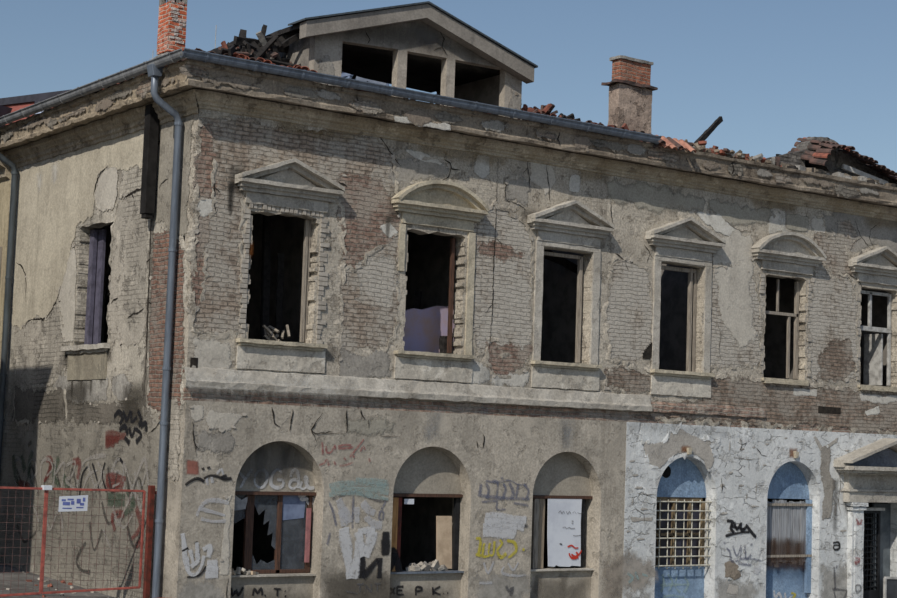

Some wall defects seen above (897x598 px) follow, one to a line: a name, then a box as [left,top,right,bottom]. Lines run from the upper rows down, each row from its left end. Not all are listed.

spalling [315,55,464,131]
peeling [529,162,556,196]
spalling [756,168,879,198]
crack [487,158,550,367]
crack [25,287,61,326]
spalling [9,111,449,481]
spalling [467,199,536,388]
spalling [601,180,897,520]
crack [272,409,398,440]
spalling [603,552,656,598]
spalling [718,561,756,598]
spalling [821,565,847,598]